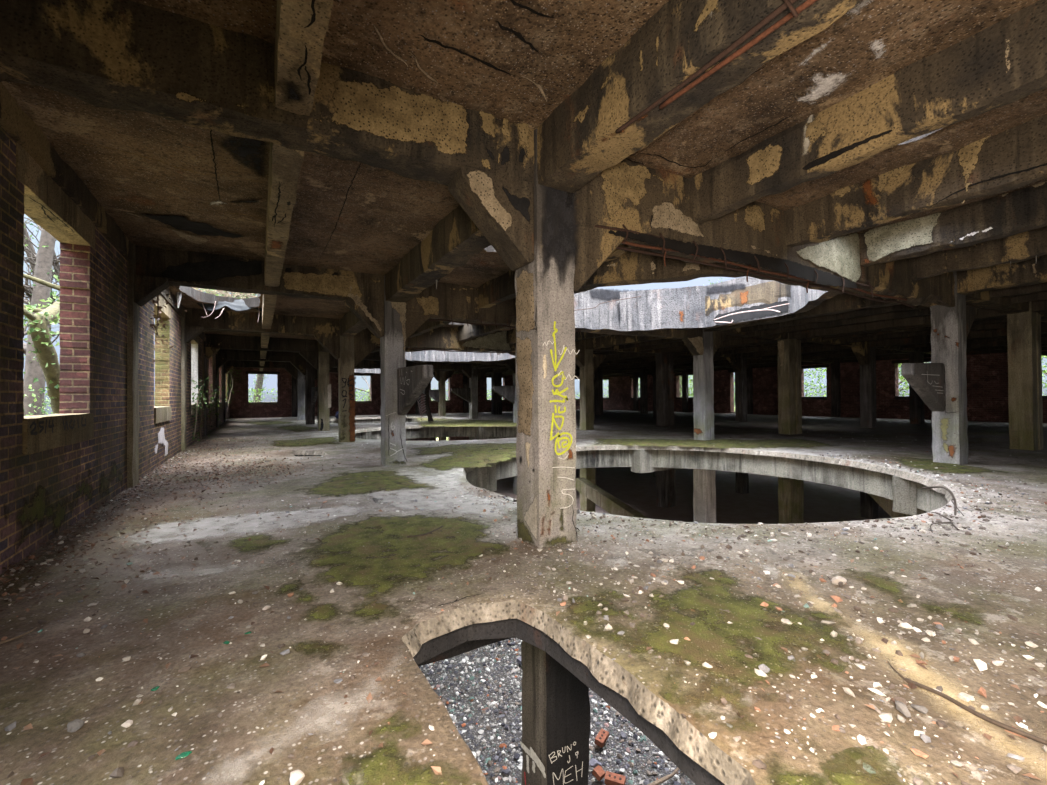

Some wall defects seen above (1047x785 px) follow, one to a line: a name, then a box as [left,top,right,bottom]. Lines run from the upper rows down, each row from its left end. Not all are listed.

crack [297,0,316,95]
crack [420,35,515,76]
crack [496,0,554,53]
peeling [694,0,719,32]
peeling [314,80,529,155]
peeling [573,104,591,123]
peeling [467,153,512,231]
peeling [746,144,783,185]
spalling [802,127,901,170]
peeling [957,135,991,204]
spalling [601,161,858,288]